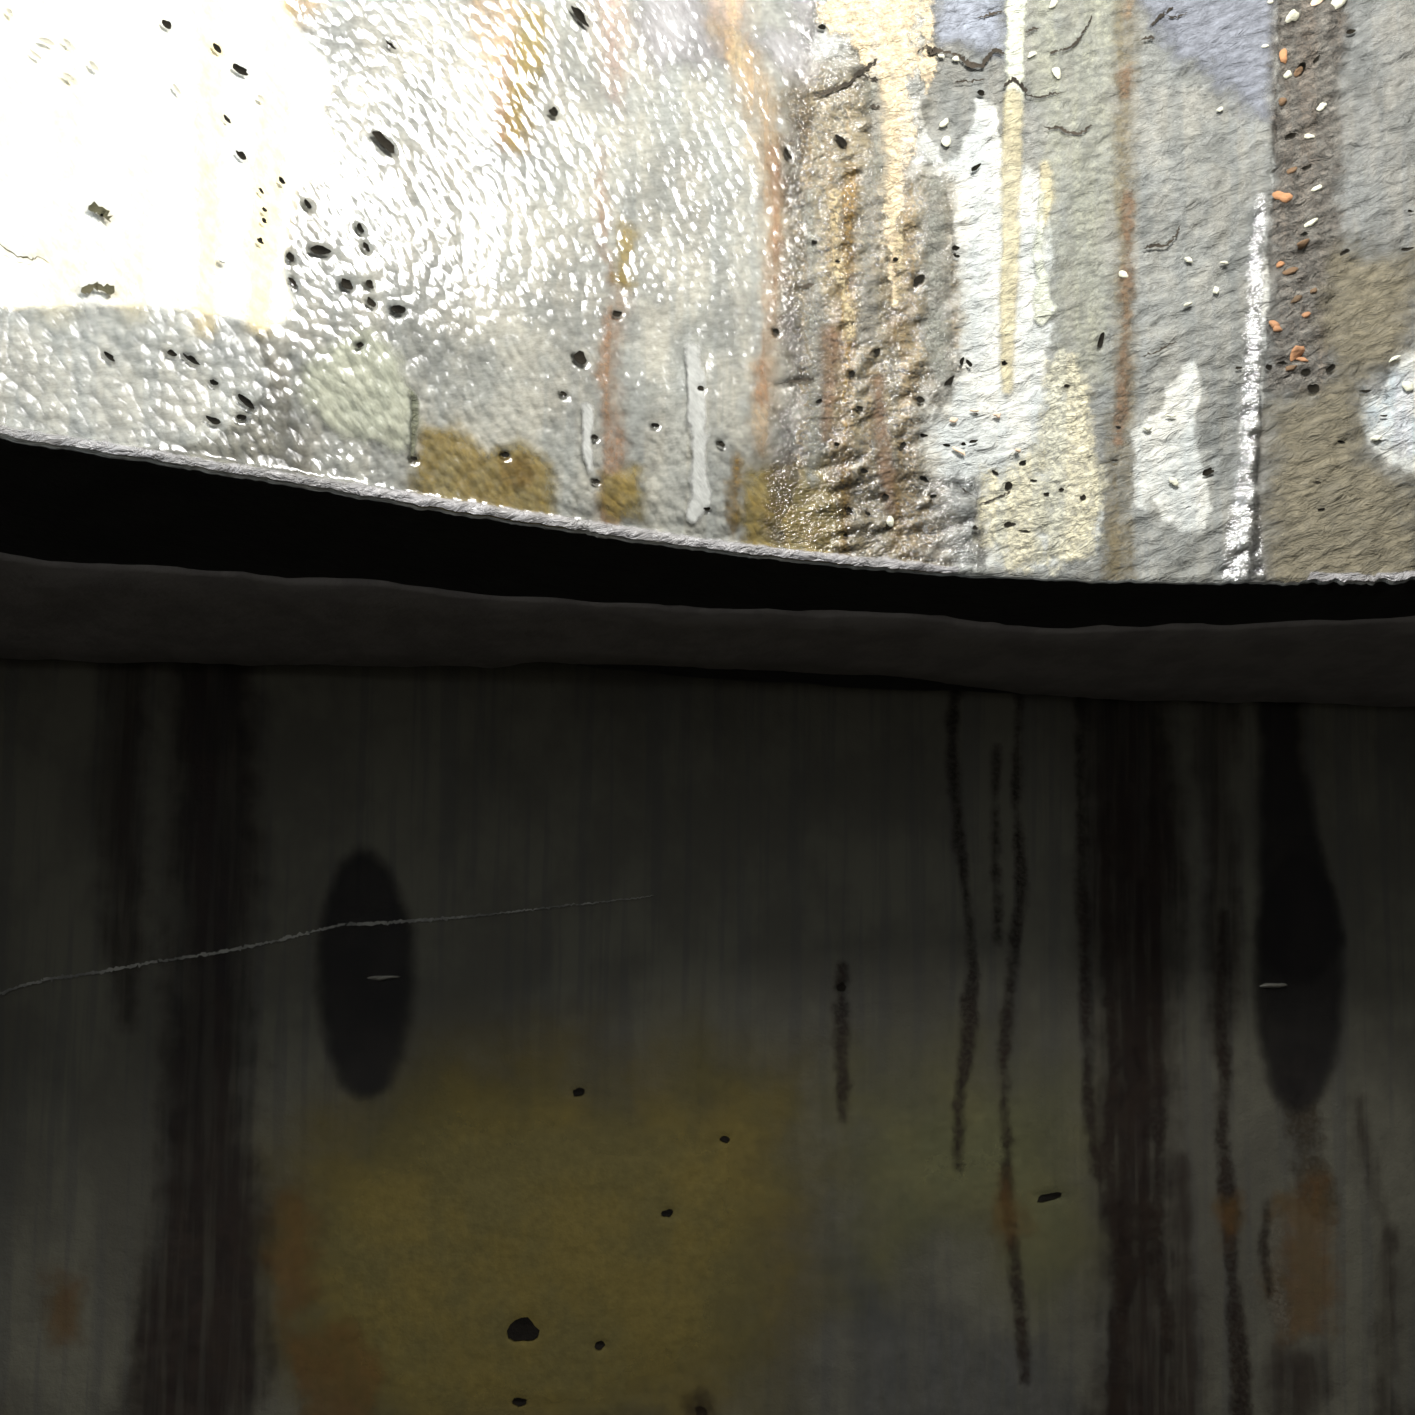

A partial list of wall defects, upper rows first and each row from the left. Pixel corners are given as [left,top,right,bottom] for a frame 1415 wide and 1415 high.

leakage [1138,0,1276,117]
leakage [408,390,419,456]
leakage [1359,370,1415,456]
leakage [132,663,257,1415]
crack [0,895,652,995]
leakage [953,918,978,1167]
leakage [992,814,1029,1381]
leakage [1077,697,1197,1415]